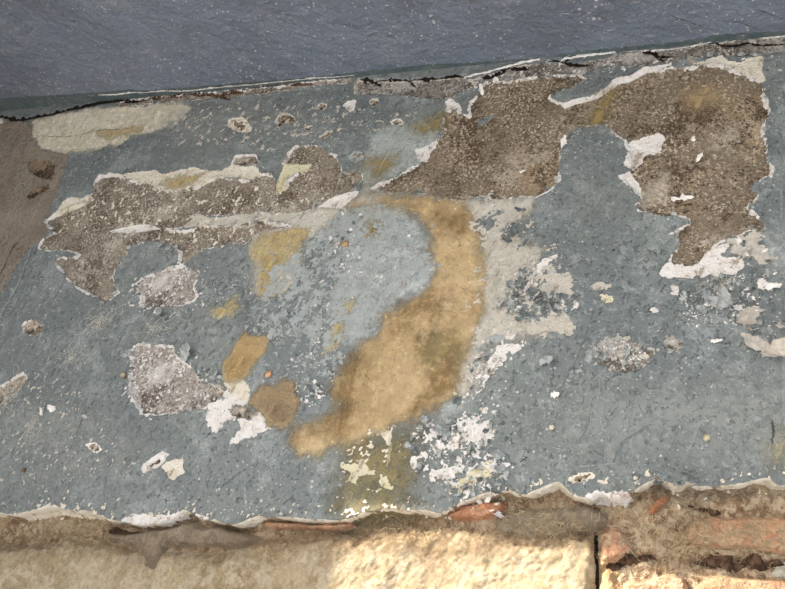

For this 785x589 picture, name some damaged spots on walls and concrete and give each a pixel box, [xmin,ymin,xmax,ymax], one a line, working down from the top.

crack [360,59,589,87]
crack [628,49,678,62]
crack [710,40,784,48]
crack [0,83,313,121]
flaking render [27,38,785,358]
flaking render [21,319,44,336]
peeling [453,254,579,406]
flaking render [567,333,653,384]
flaking render [120,341,271,444]
peeling [376,430,392,446]
peeling [403,415,510,519]